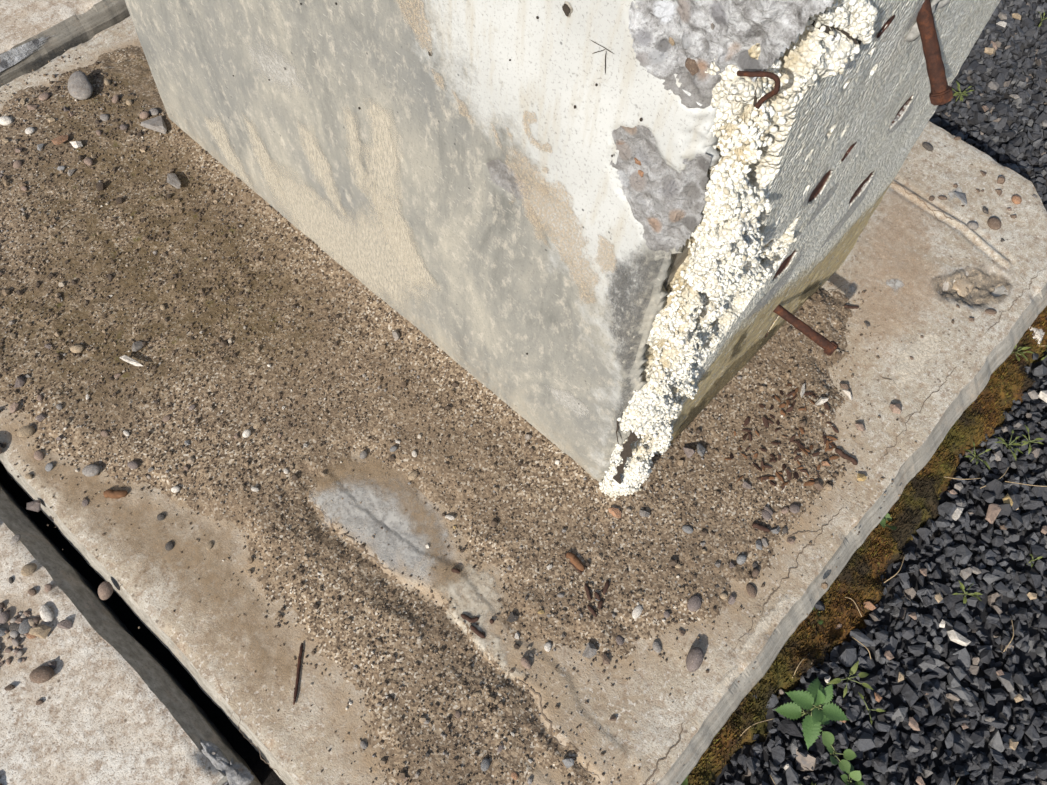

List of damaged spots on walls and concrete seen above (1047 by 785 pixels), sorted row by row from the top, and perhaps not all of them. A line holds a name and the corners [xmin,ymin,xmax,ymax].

spalling [628,0,834,109]
crack [809,18,862,48]
spalling [610,118,712,256]
crack [892,182,960,223]
water stain [609,255,665,432]
water stain [670,184,891,444]
crack [612,421,638,484]